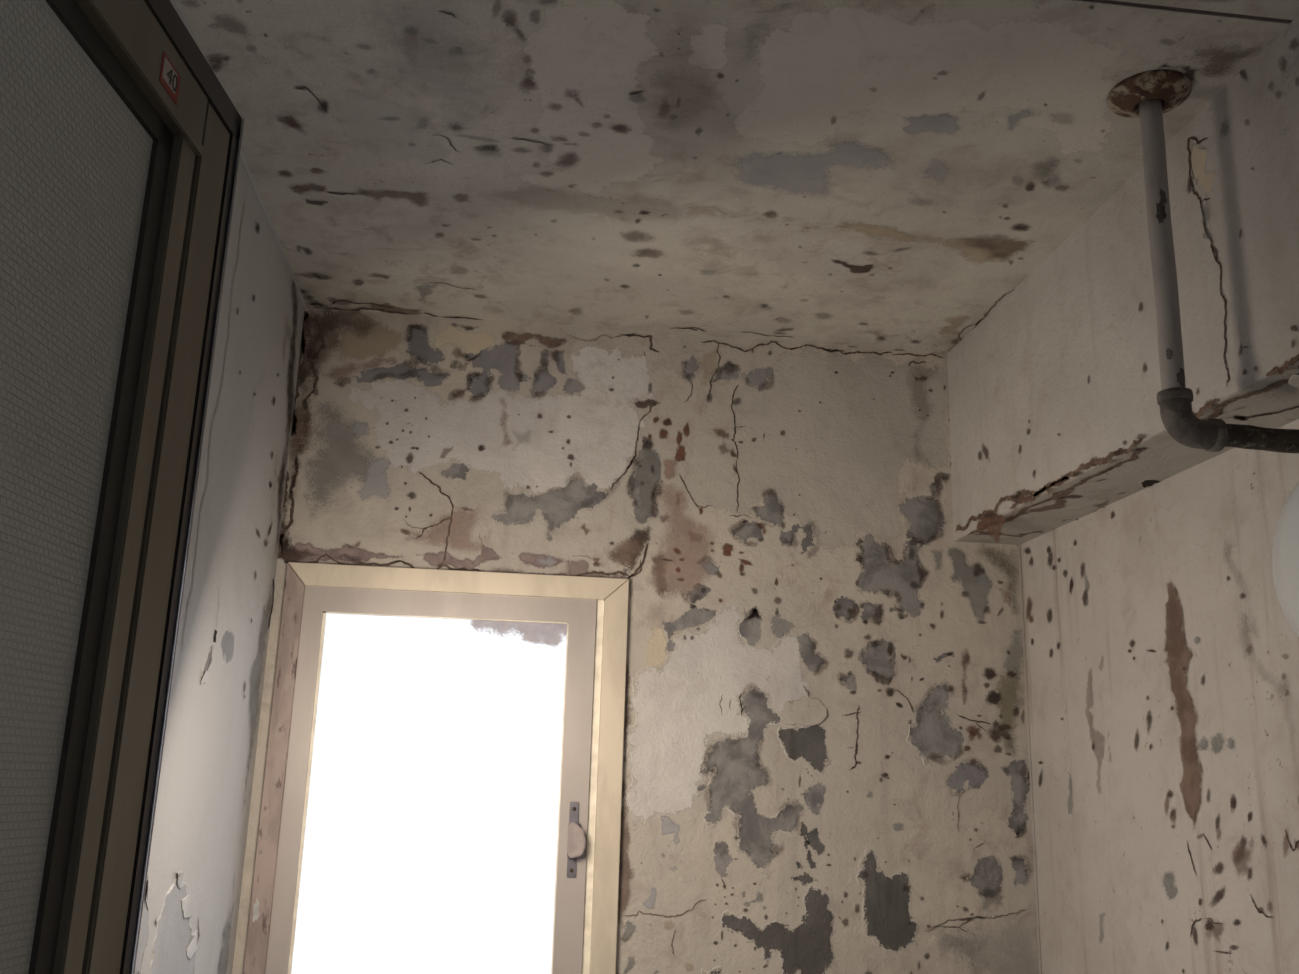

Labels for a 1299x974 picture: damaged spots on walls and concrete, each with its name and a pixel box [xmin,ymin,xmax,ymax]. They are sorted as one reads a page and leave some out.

water stain [256,281,479,566]
peeling [338,324,584,401]
peeling [492,477,608,541]
peeling [628,437,661,570]
crack [570,327,943,519]
corrosion [955,435,1144,543]
crack [1187,136,1299,421]
corrosion [1266,354,1299,376]
peeling [696,685,830,889]
peeling [832,473,1030,838]
corrosion [1164,583,1202,828]
peeling [714,847,919,974]